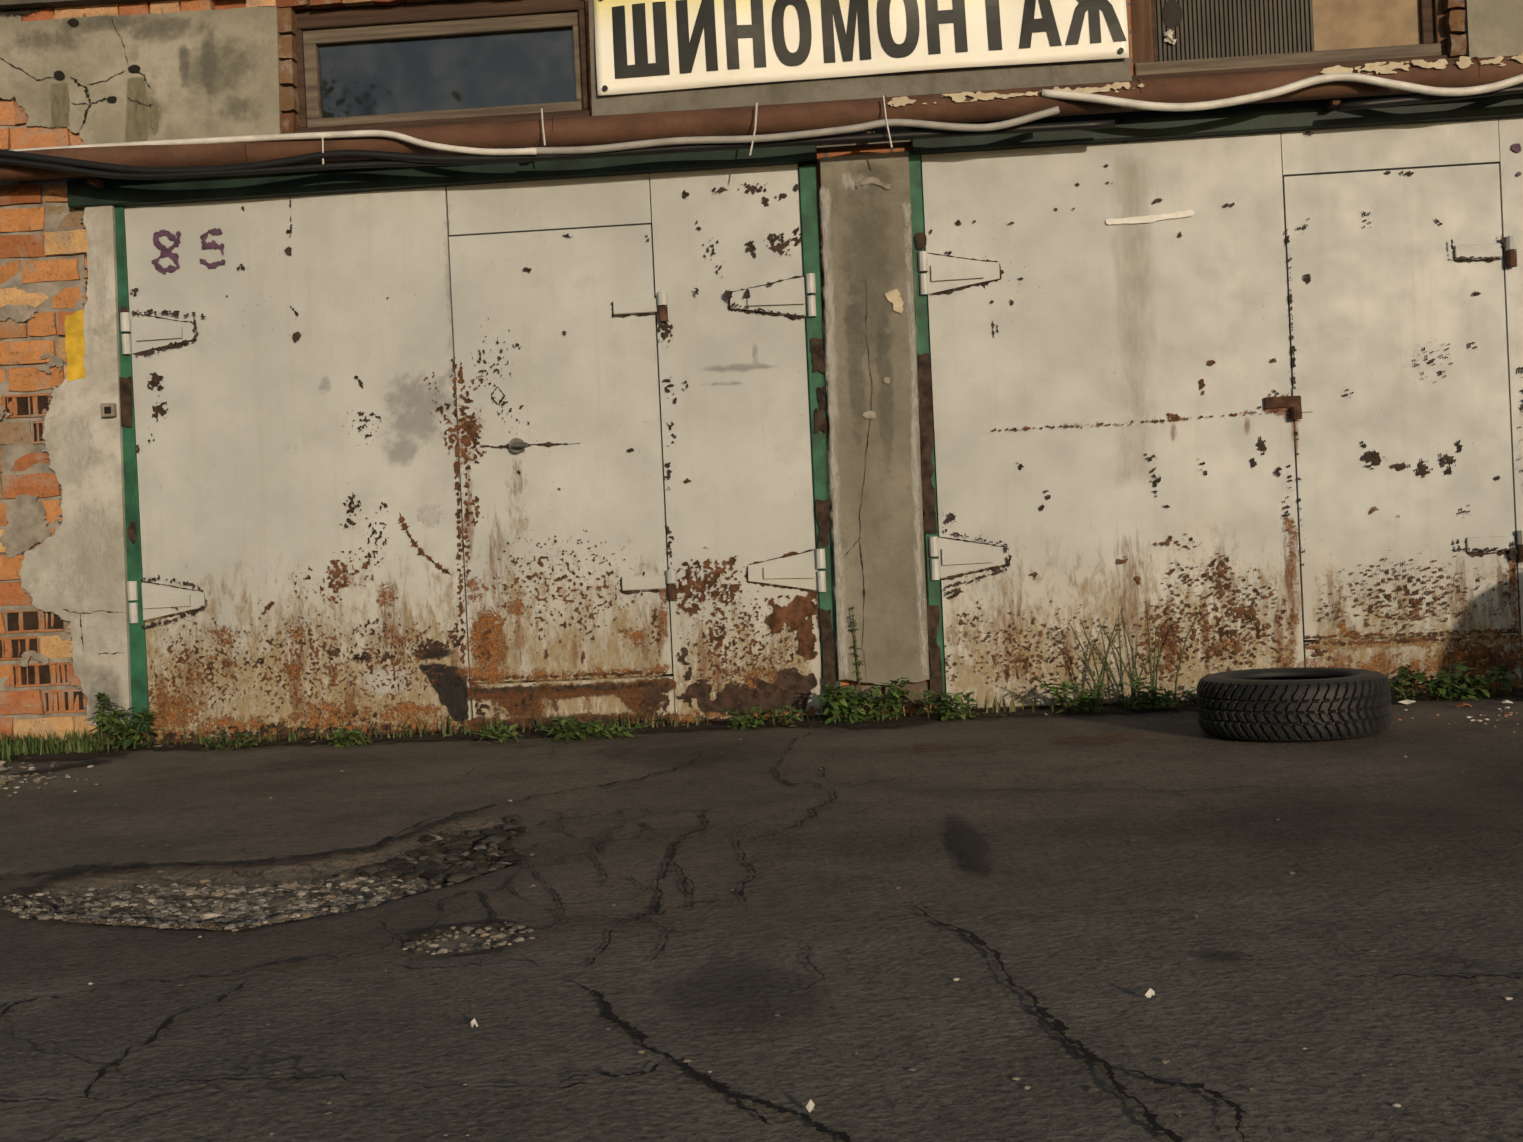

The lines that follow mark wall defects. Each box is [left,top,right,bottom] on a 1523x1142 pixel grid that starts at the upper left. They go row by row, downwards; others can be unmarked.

crack [0,19,154,132]
corrosion [914,232,927,249]
spalling [0,177,108,744]
corrosion [810,338,827,433]
corrosion [918,353,937,534]
corrosion [1244,407,1299,422]
corrosion [816,499,831,547]
corrosion [142,519,837,742]
corrosion [927,516,1523,708]
spalling [11,804,496,893]